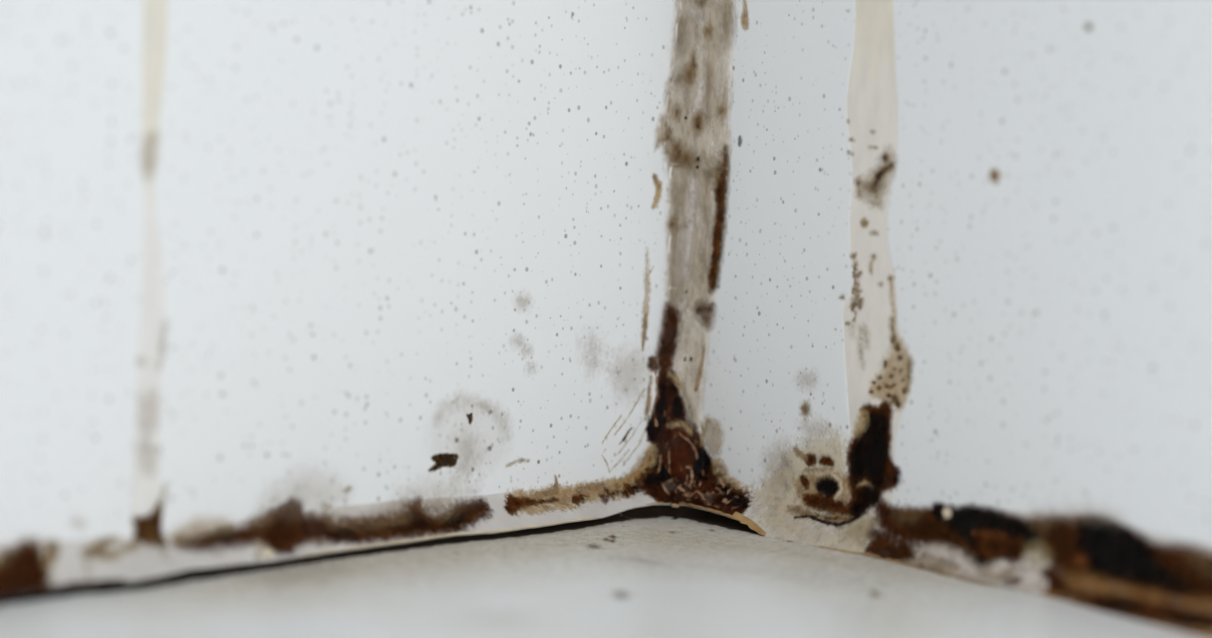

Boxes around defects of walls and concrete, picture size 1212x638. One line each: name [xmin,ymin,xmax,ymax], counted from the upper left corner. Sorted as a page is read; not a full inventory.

leakage [505,0,1212,638]
leakage [83,488,489,561]
peeling [732,512,766,536]
leakage [0,540,59,594]